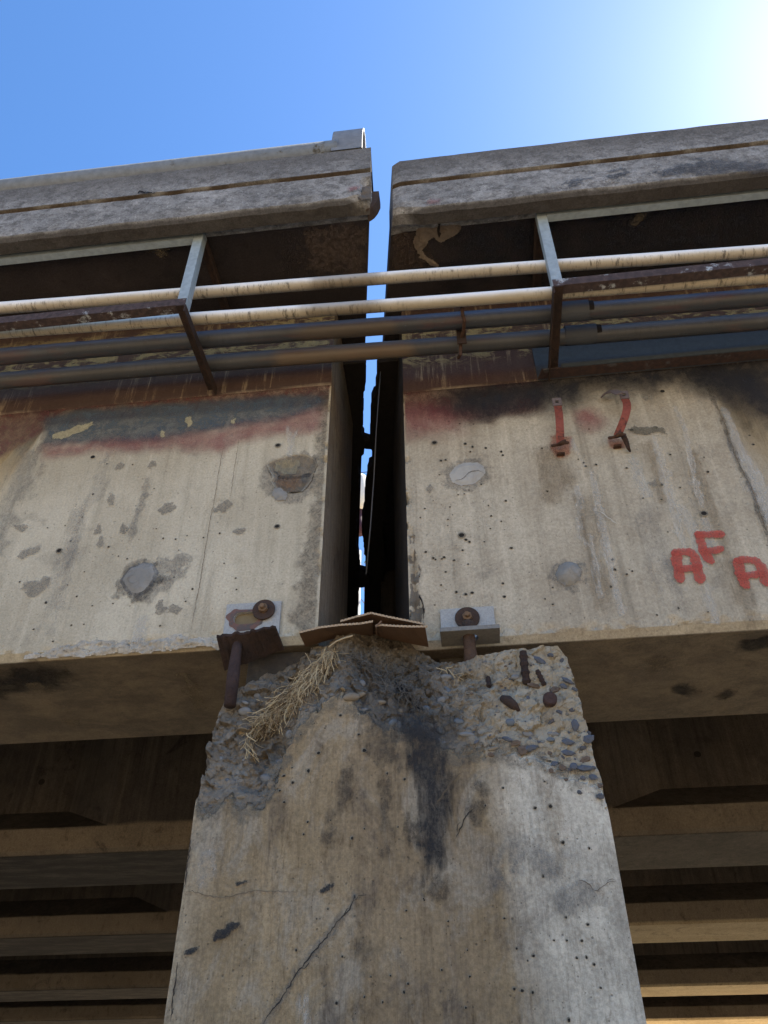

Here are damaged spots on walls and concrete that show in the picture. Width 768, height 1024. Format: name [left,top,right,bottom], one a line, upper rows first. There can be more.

spalling [413,224,461,267]
spalling [267,454,317,500]
rust [519,650,546,686]
spalling [197,633,604,819]
rust [500,695,520,712]
crack [263,895,362,1024]